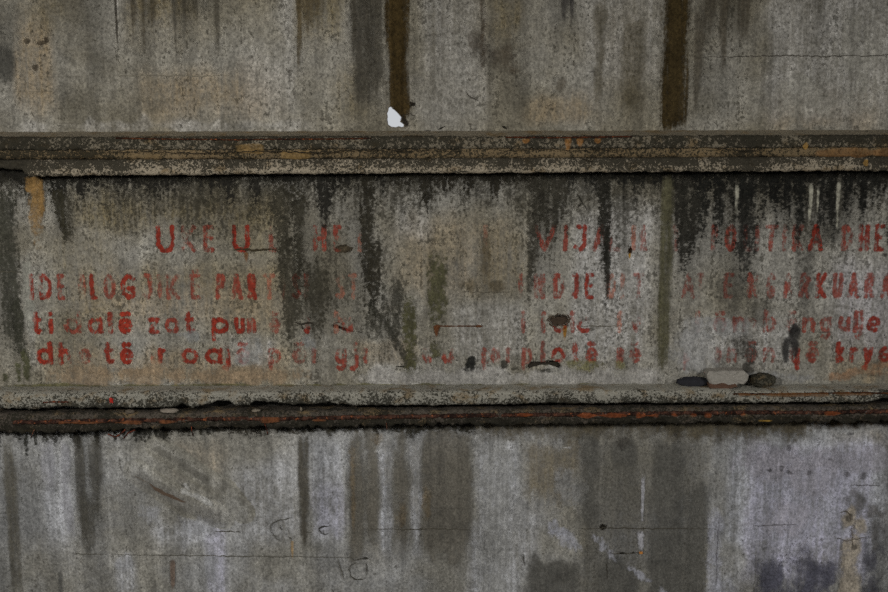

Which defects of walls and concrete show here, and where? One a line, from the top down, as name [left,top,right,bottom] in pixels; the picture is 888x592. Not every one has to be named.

leakage [297,0,319,62]
leakage [351,0,410,122]
leakage [660,0,690,131]
crack [704,52,888,60]
leakage [0,168,888,385]
spalling [547,313,571,337]
leakage [1,420,888,564]
leakage [530,555,579,592]
leakage [593,445,709,592]